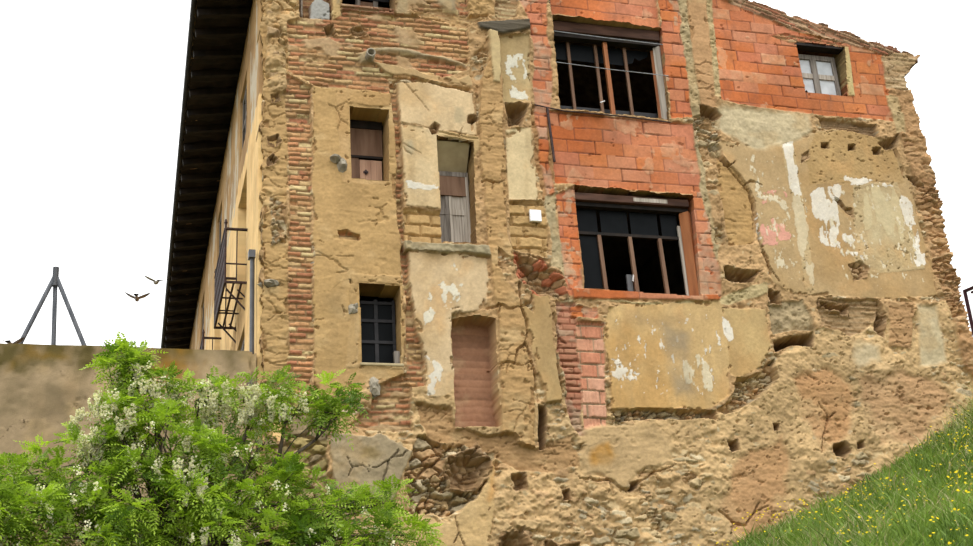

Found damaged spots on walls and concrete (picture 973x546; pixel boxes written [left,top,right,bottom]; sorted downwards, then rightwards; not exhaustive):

spalling [505,53,530,127]
spalling [872,132,903,155]
peeling [750,141,926,284]
spalling [350,83,463,433]
spalling [724,265,762,283]
spalling [611,330,816,423]
peeling [696,318,734,391]
crack [347,449,408,482]
spalling [510,471,529,492]
spalling [538,402,549,451]
spalling [832,439,866,459]
spalling [496,524,582,546]